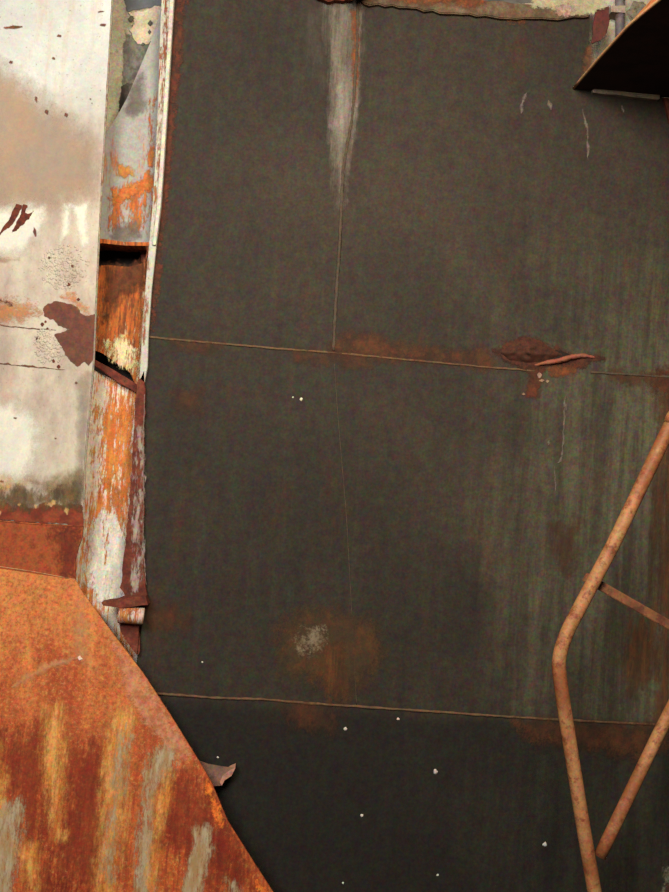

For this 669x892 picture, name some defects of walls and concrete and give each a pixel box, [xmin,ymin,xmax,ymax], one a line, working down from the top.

flaking render [128,6,161,46]
flaking render [484,0,605,17]
water stain [0,78,90,203]
corrosion [0,0,188,366]
water stain [325,1,361,187]
corrosion [526,366,577,398]
corrosion [0,403,135,564]
corrosion [0,702,137,892]
corrosion [161,770,266,892]
corrosion [574,723,655,760]